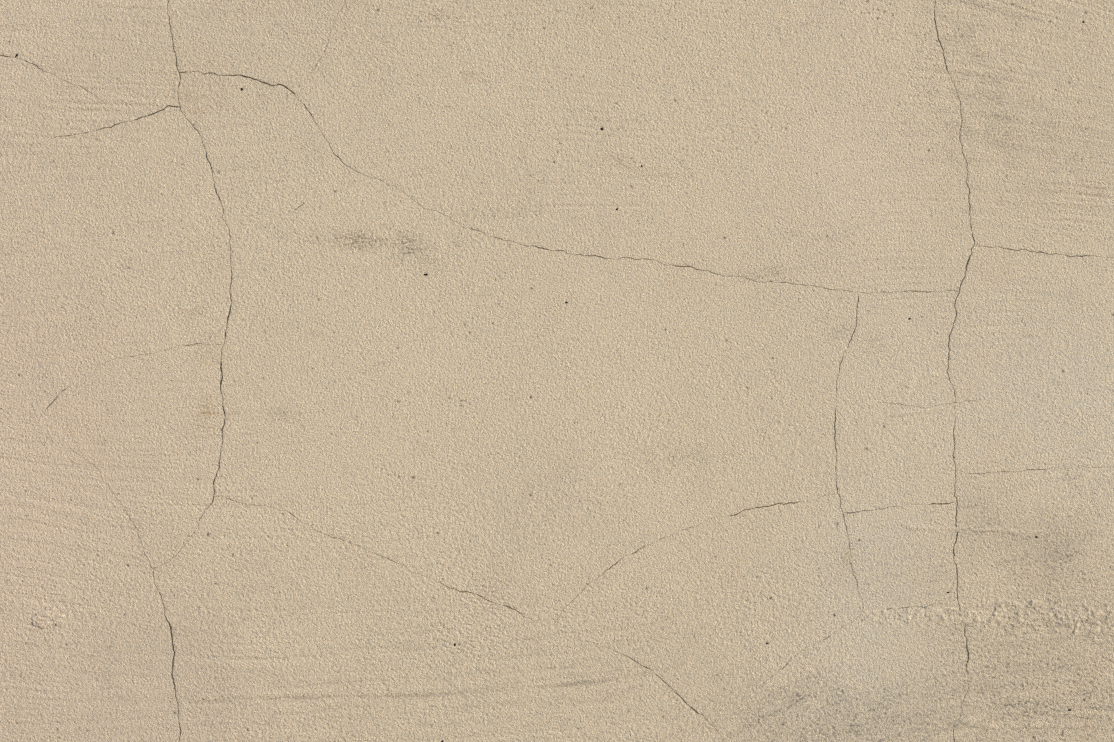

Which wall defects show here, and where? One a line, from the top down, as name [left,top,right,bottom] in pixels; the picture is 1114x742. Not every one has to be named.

crack [38,1,657,739]
crack [589,641,725,741]
crack [560,501,800,616]
crack [674,0,1113,681]